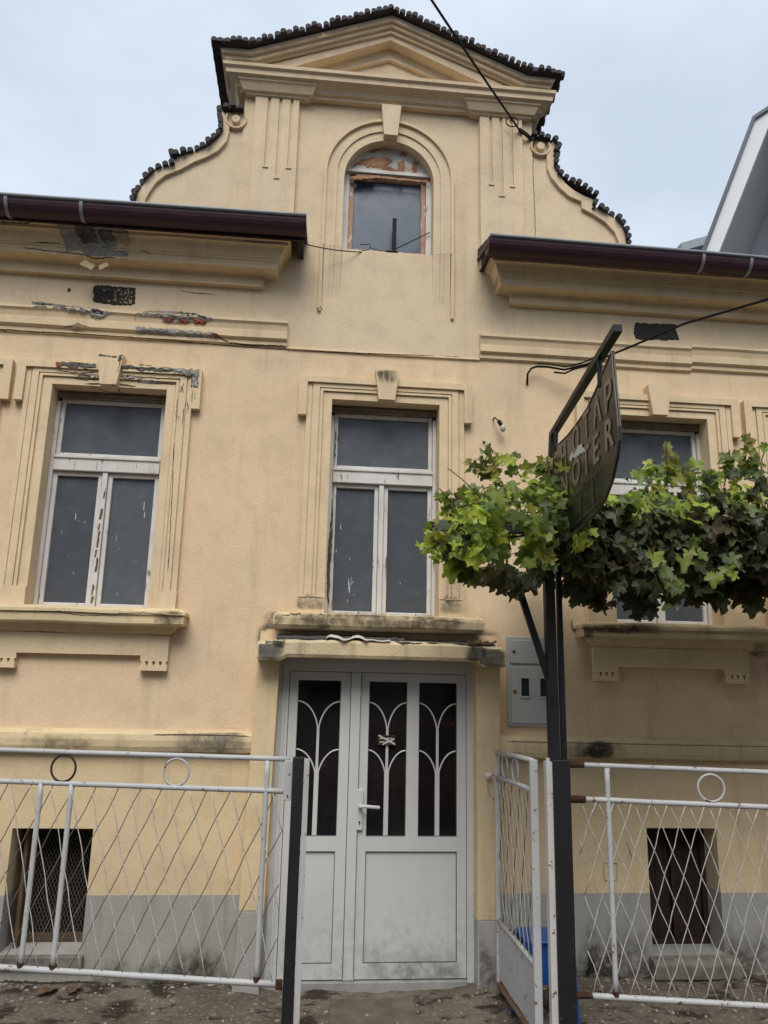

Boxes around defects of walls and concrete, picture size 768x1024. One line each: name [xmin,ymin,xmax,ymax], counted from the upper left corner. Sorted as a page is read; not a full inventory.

peeling [350,148,431,183]
spalling [24,224,130,271]
spalling [28,301,114,319]
spalling [56,354,199,388]
water stain [575,742,612,758]